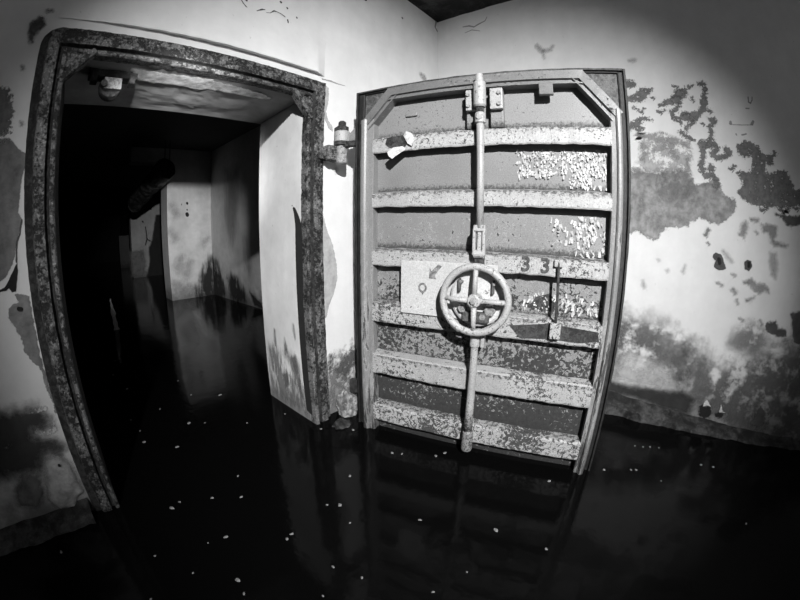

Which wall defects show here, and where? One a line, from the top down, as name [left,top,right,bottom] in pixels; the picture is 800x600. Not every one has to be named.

peeling [626,79,800,214]
peeling [0,87,57,413]
spalling [713,253,726,270]
leakage [269,329,306,408]
leakage [610,312,800,441]
leakage [0,406,64,479]